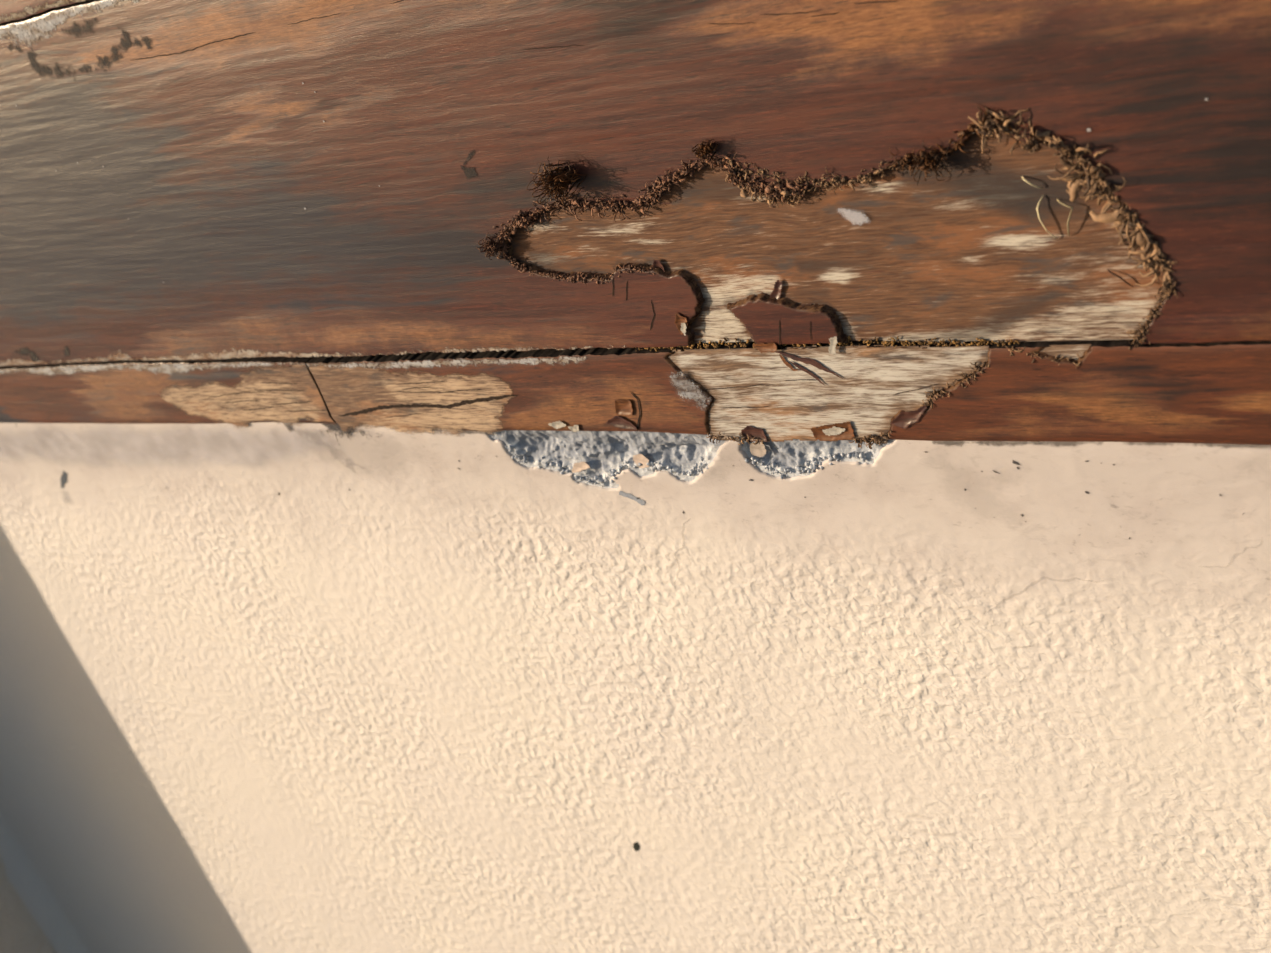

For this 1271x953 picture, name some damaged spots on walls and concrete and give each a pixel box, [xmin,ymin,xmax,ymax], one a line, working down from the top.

leakage [0,0,151,77]
peeling [770,280,783,299]
peeling [674,313,688,336]
peeling [753,336,843,385]